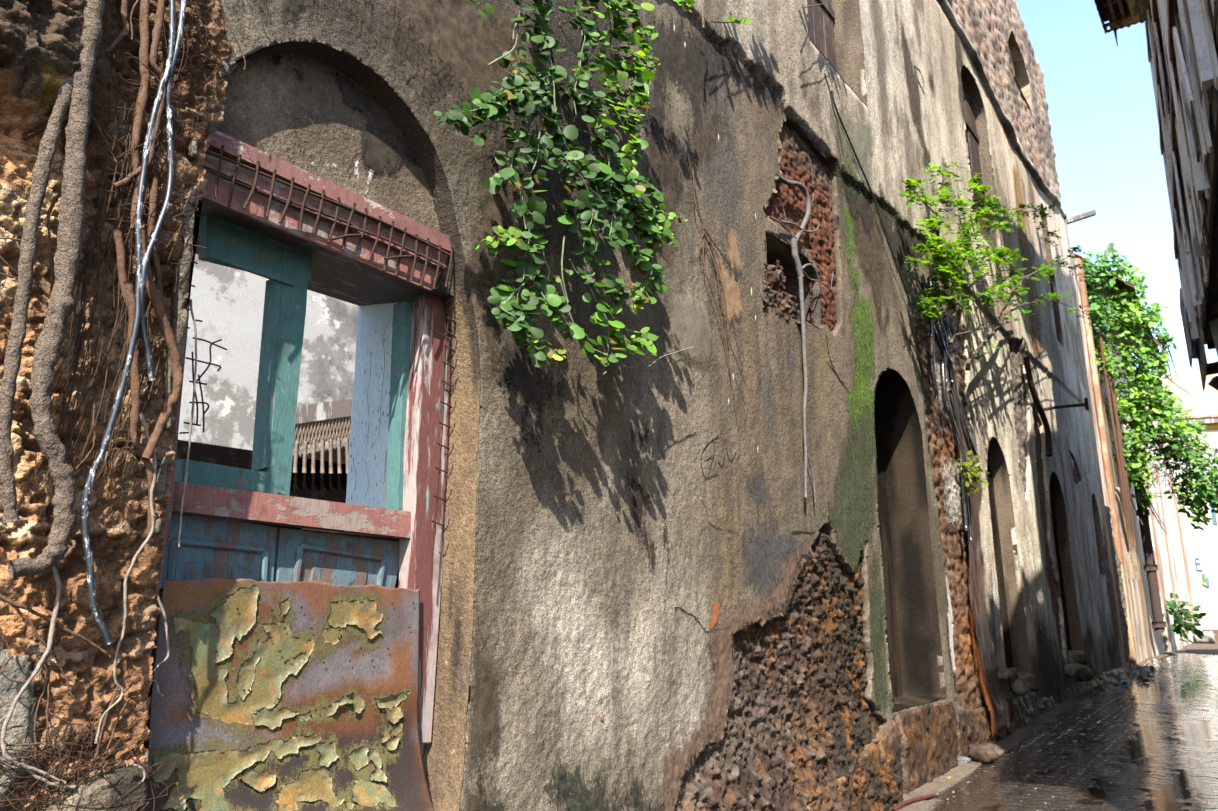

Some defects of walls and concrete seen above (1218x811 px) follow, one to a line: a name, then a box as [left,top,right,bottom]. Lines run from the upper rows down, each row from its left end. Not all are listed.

water stain [643,12,785,268]
flaking render [762,122,837,332]
flaking render [0,0,457,811]
flaking render [913,288,988,710]
peeling [655,545,812,811]